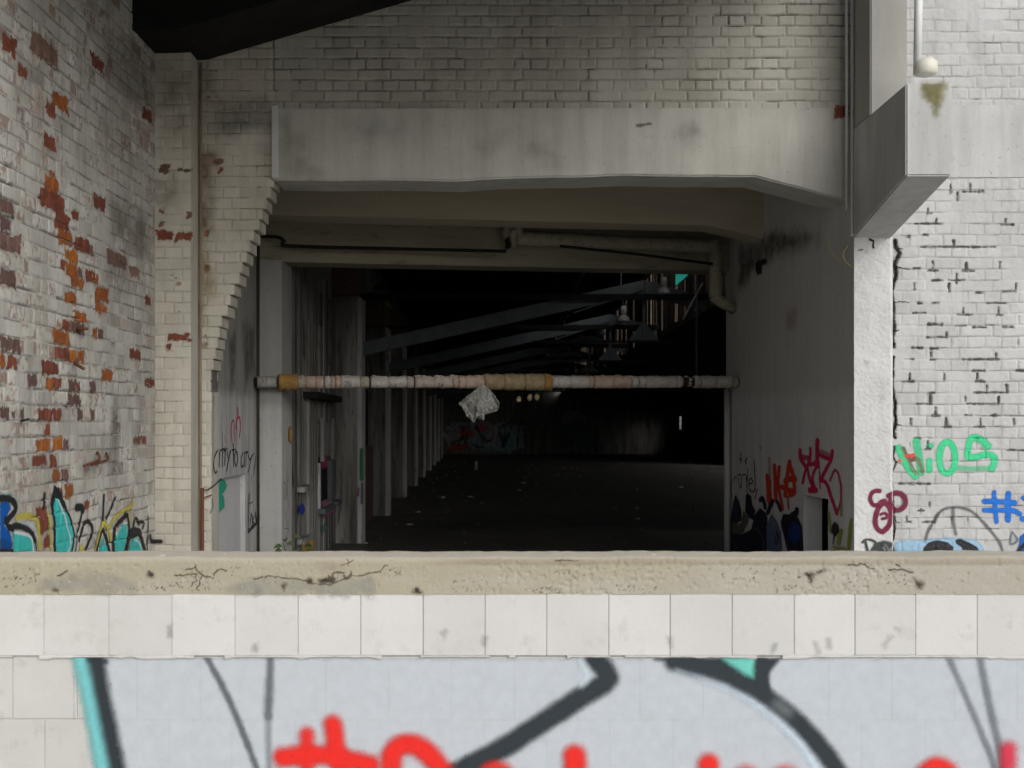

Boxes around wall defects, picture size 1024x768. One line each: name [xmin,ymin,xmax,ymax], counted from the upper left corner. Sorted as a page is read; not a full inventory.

peeling [2,32,27,80]
peeling [30,32,58,71]
peeling [45,91,70,119]
damp [924,83,946,103]
peeling [44,132,56,152]
peeling [155,209,209,242]
peeling [107,249,139,280]
peeling [0,170,114,499]
peeling [166,333,207,350]
crack [858,238,910,469]
crack [174,564,227,588]
crack [253,560,387,585]